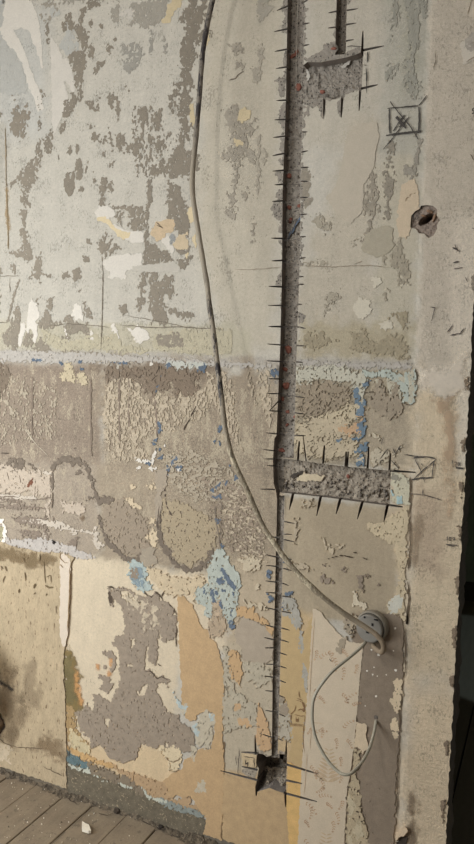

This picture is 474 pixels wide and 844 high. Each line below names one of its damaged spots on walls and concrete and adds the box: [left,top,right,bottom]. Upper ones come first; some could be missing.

spalling [304,18,361,81]
flaking render [385,0,428,100]
spalling [304,90,359,119]
spalling [411,206,440,238]
flaking render [0,0,308,844]